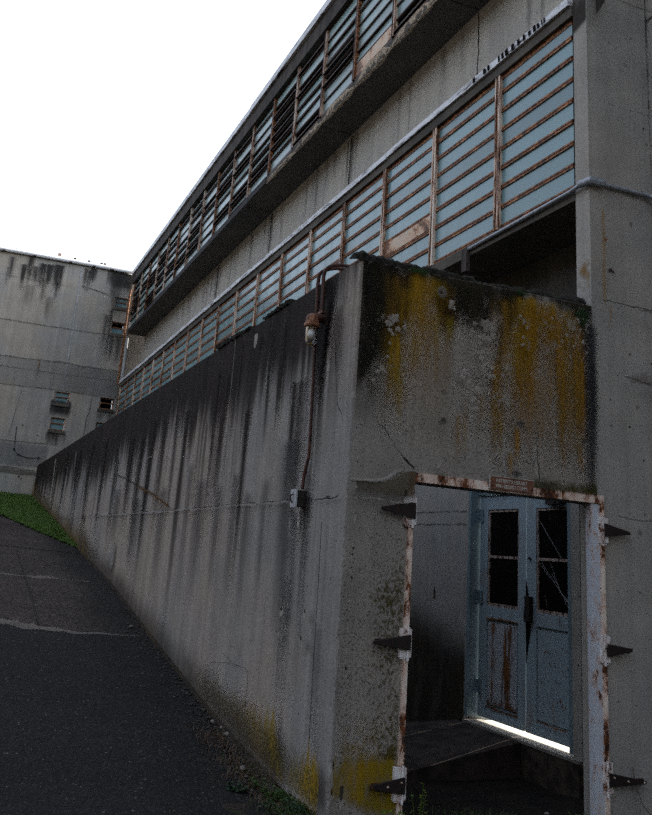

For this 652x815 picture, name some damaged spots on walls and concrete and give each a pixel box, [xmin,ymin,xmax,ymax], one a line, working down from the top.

water stain [573,0,586,33]
water stain [10,257,64,290]
water stain [497,296,569,376]
crack [603,300,652,314]
water stain [580,309,595,481]
water stain [31,268,346,599]
crack [377,421,415,470]
corrosion [485,617,518,718]
water stain [332,753,396,814]